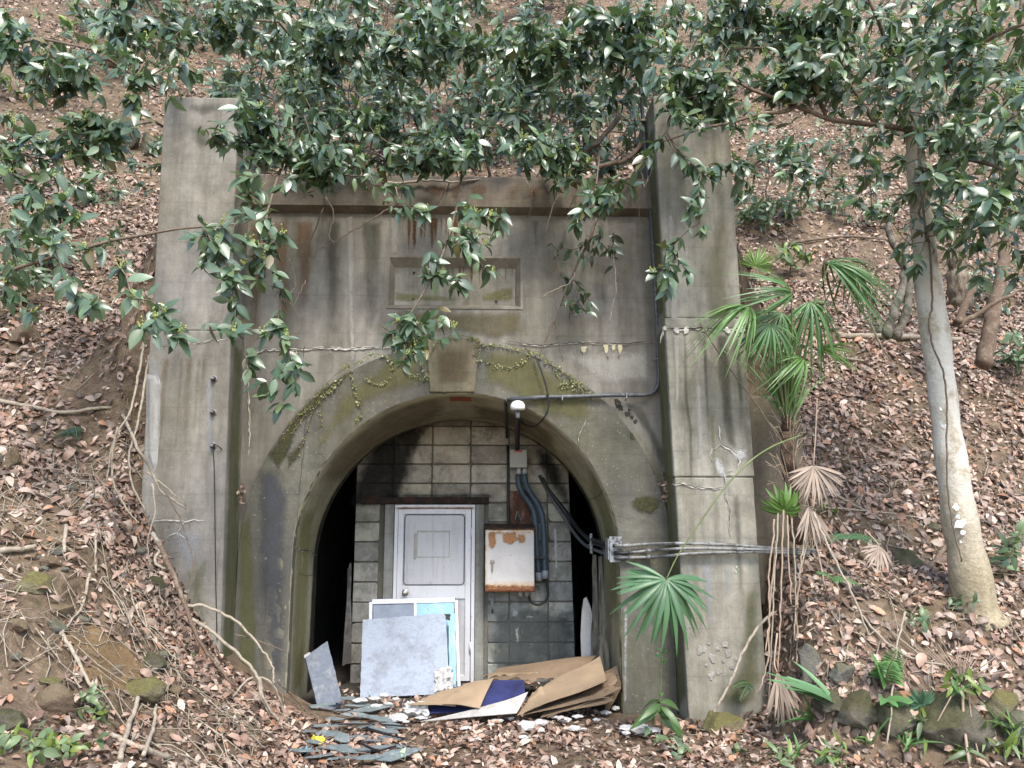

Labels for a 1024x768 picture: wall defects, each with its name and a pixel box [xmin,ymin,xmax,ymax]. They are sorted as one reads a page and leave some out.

rust [408,218,458,245]
crack [674,427,746,535]
water stain [261,474,285,668]